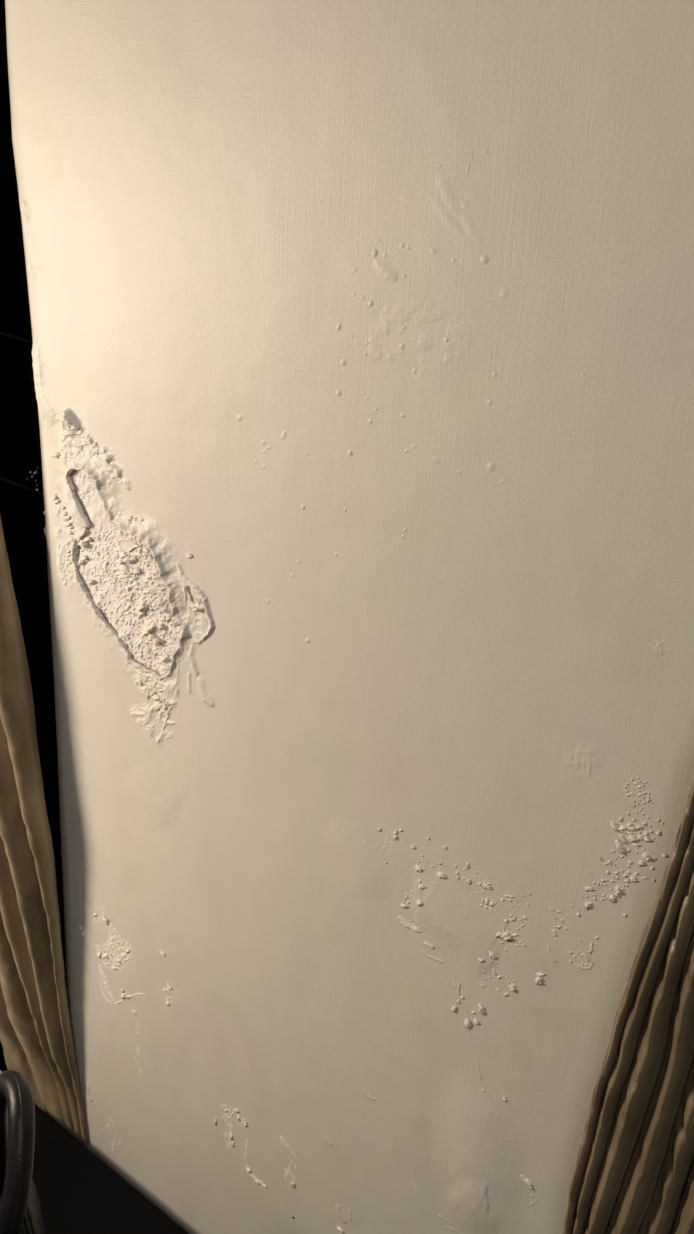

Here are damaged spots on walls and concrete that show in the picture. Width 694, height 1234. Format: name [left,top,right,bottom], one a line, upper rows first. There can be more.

flaking render [43,447,215,752]